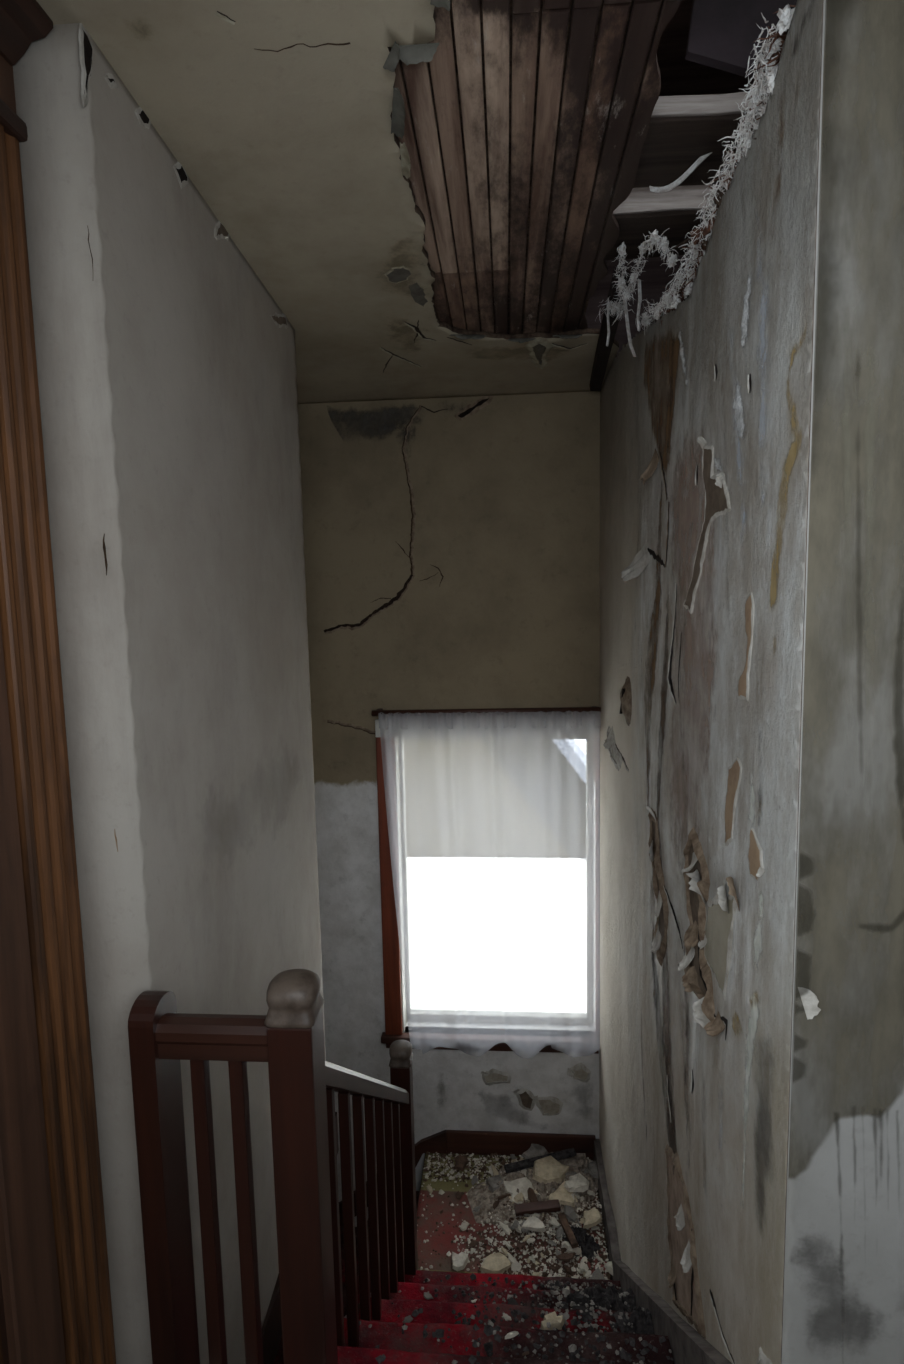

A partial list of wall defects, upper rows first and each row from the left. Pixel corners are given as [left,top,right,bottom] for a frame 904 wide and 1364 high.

crack [256,42,350,52]
crack [380,320,471,373]
crack [323,405,447,635]
peeling [683,437,731,614]
damp [793,0,904,1129]
peeling [738,593,754,701]
peeling [725,756,742,846]
peeling [747,828,765,881]
peeling [646,806,740,1021]
peeling [481,1068,563,1116]
damp [788,1106,813,1178]
peeling [665,1144,706,1339]